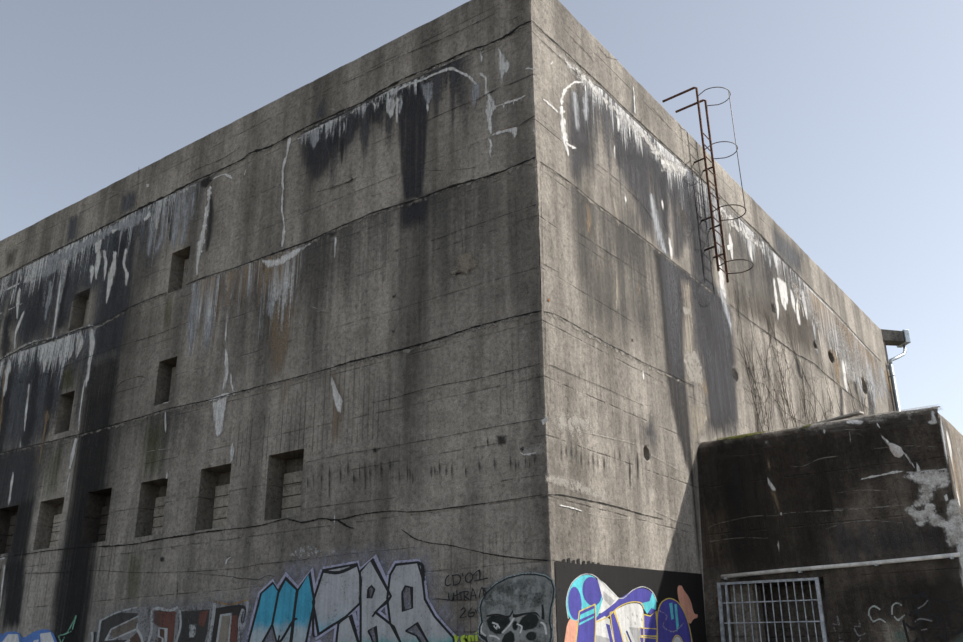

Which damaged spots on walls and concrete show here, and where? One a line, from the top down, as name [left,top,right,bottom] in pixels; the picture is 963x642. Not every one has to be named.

damp [0,49,525,642]
crack [0,475,661,599]
damp [533,55,963,570]
damp [837,570,963,642]